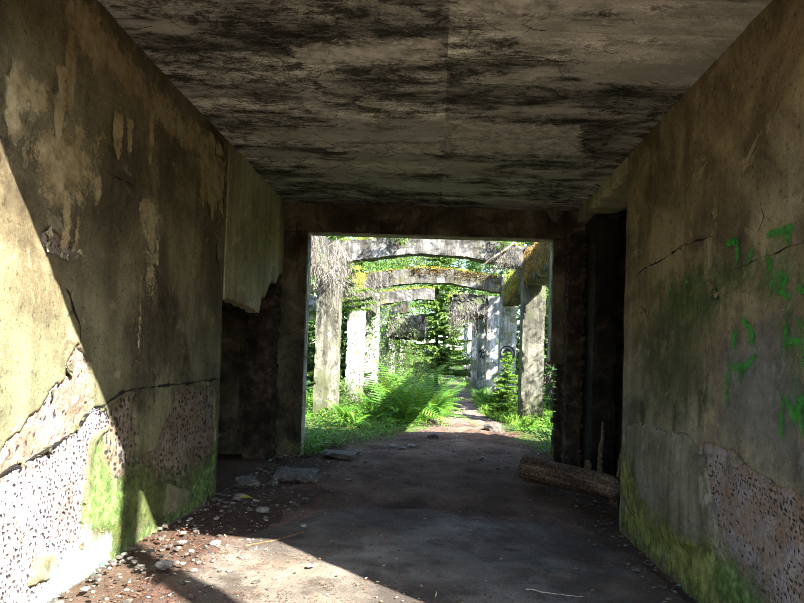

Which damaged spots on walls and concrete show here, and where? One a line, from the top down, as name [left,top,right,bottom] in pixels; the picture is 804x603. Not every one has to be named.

water stain [455,0,563,17]
water stain [290,37,446,65]
water stain [4,0,227,258]
water stain [327,117,585,158]
flaking render [41,227,82,261]
water stain [138,196,162,349]
crack [638,235,714,274]
crack [733,242,803,270]
crack [66,288,86,342]
spalling [0,348,214,603]
spalling [699,443,804,603]